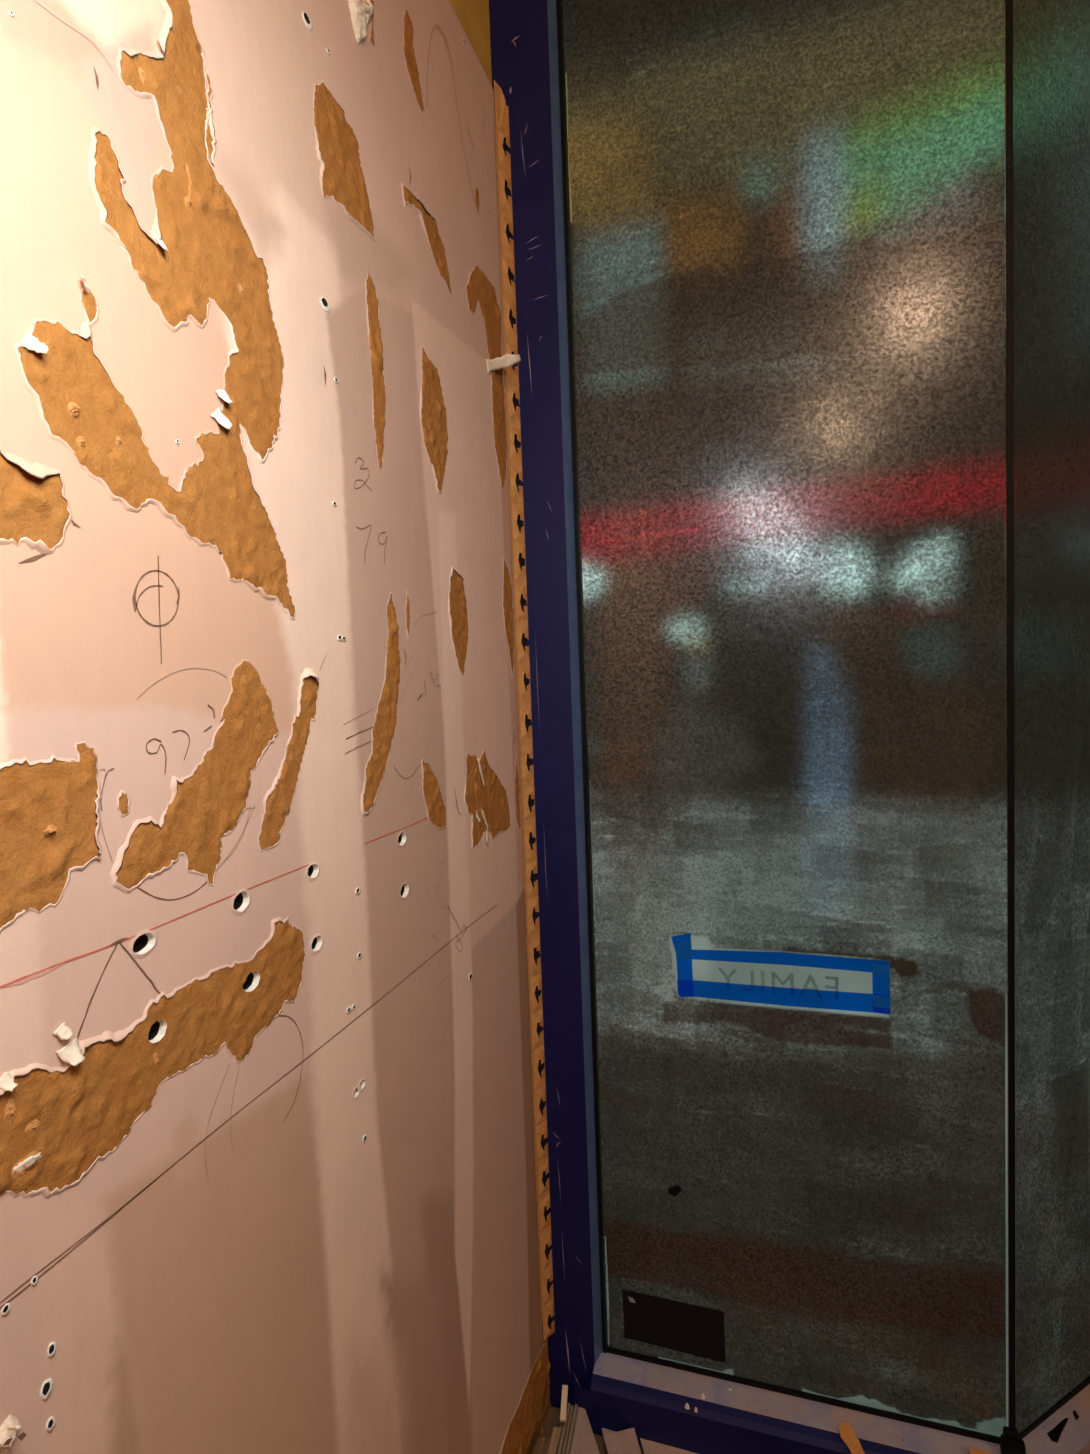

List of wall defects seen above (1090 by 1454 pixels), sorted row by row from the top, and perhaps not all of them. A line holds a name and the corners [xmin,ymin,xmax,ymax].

peeling [348,0,375,47]
peeling [403,7,424,114]
peeling [313,81,376,241]
peeling [13,0,296,621]
peeling [401,182,507,494]
peeling [0,441,73,555]
peeling [448,566,469,678]
peeling [360,589,411,816]
peeling [0,659,320,934]
peeling [421,758,447,831]
peeling [464,749,521,849]
peeling [0,917,323,1199]